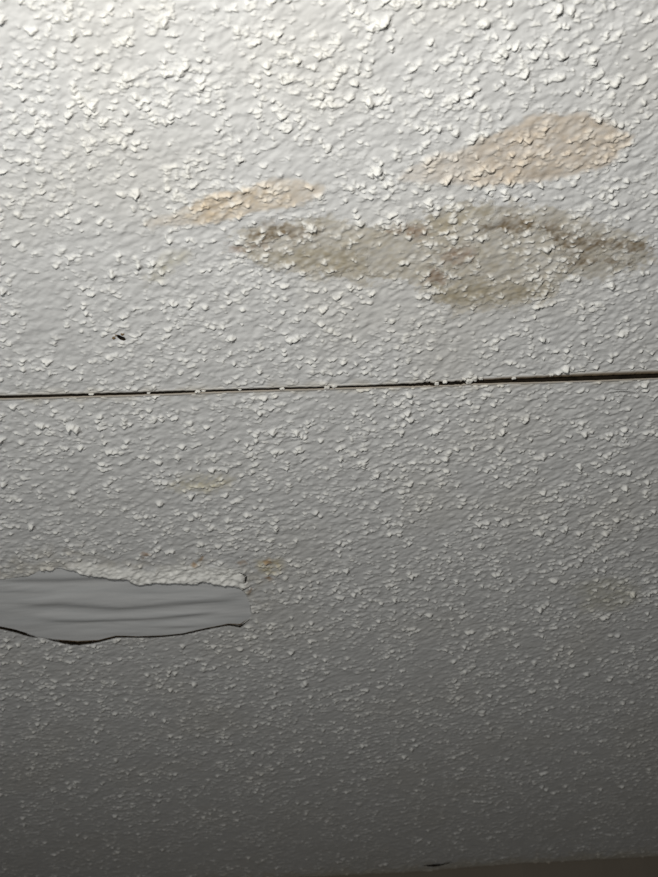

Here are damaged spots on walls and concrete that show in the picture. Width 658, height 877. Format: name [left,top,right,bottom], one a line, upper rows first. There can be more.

water stain [138,109,658,326]
crack [0,369,658,401]
spalling [0,563,251,646]